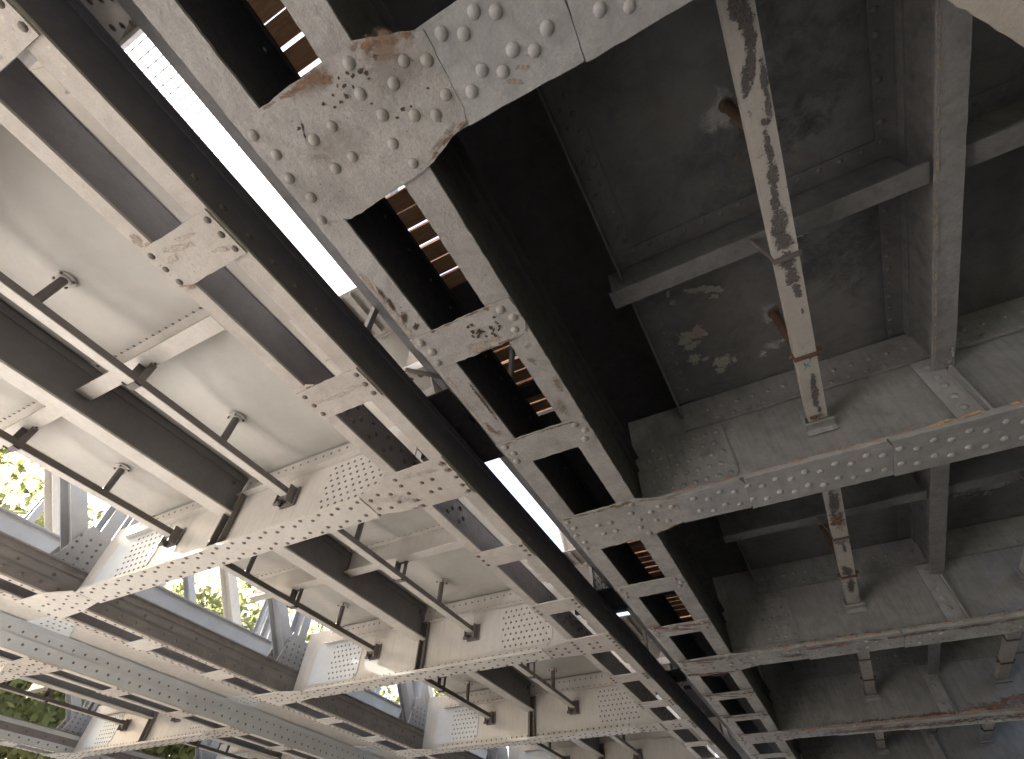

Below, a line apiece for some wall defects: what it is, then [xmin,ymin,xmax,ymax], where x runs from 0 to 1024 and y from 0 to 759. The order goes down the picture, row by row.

peeling [727,0,804,314]
peeling [676,325,737,374]
peeling [804,358,821,412]